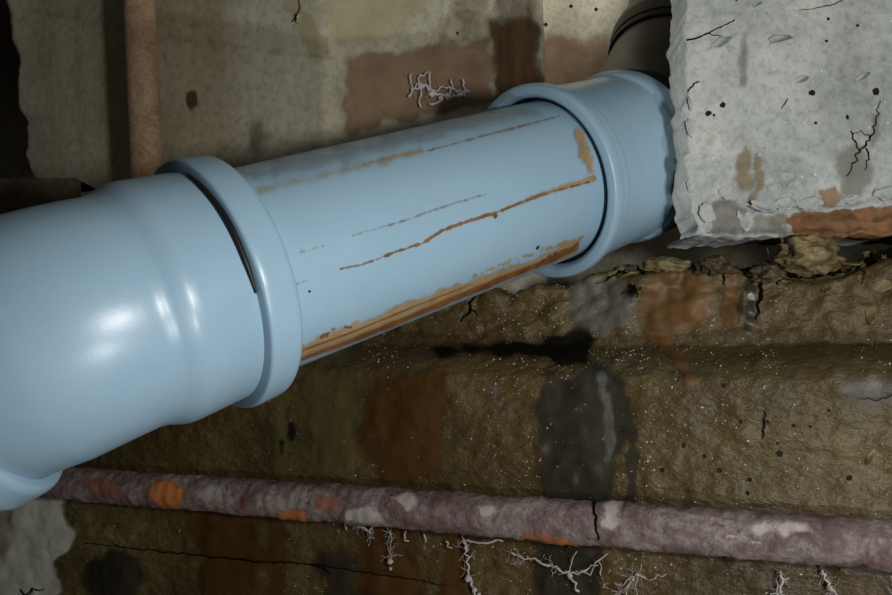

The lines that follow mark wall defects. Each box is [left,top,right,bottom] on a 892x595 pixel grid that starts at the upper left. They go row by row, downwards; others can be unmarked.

crack [687,20,735,41]
crack [846,100,881,177]
rust [782,188,892,241]
crack [461,296,478,322]
leakage [435,327,639,503]
crack [85,543,449,586]
leakage [534,540,603,595]